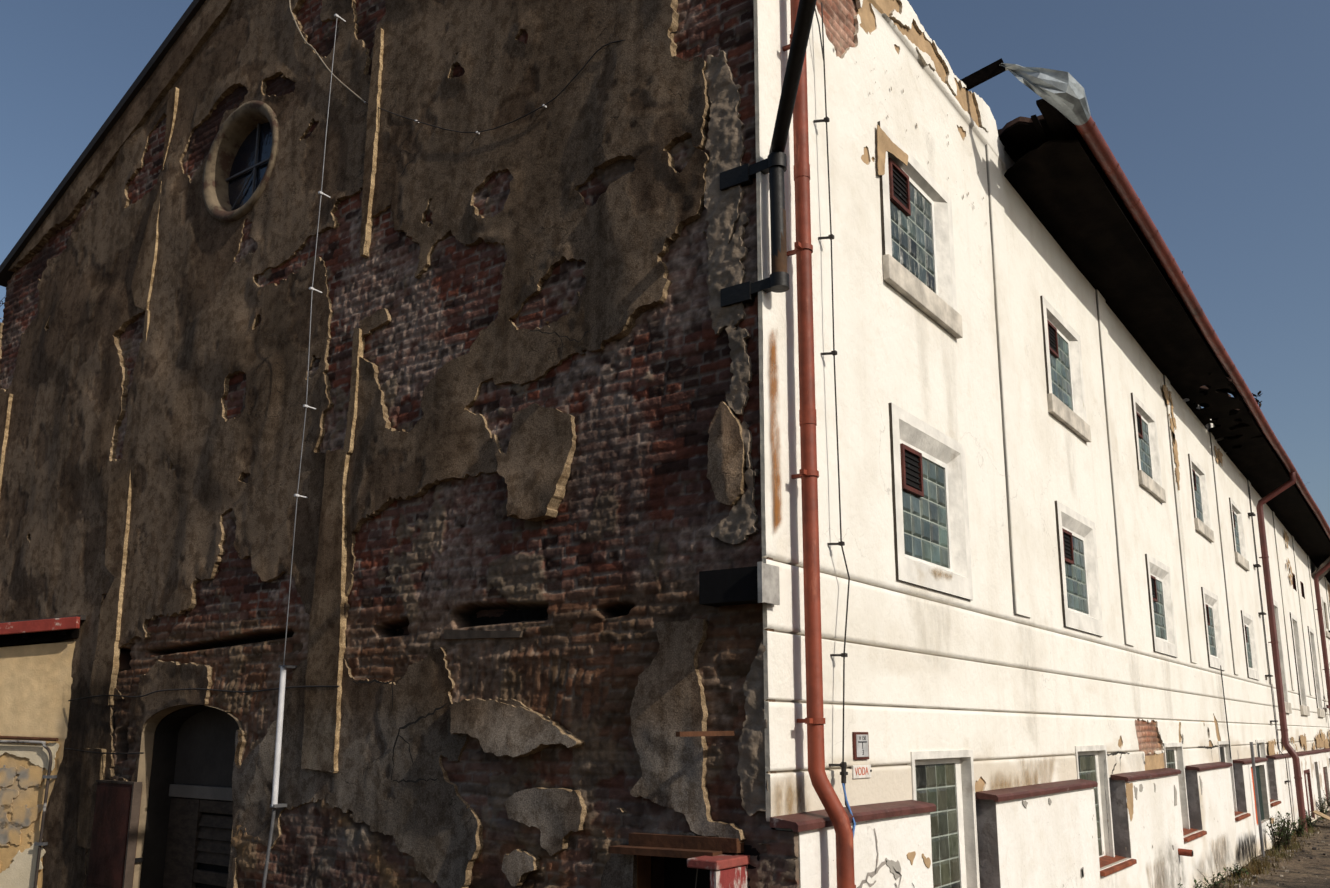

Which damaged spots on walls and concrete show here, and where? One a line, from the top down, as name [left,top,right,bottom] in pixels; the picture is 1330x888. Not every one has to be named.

flaking render [182,86,248,182]
flaking render [861,125,908,175]
flaking render [816,0,989,139]
flaking render [257,190,507,453]
flaking render [344,0,799,888]
corrosion [770,334,782,529]
flaking render [1163,384,1180,490]
flaking render [104,509,310,781]
flaking render [0,743,59,888]
flaking render [231,792,440,888]
peeling [857,828,931,888]
flaking render [1118,718,1165,821]